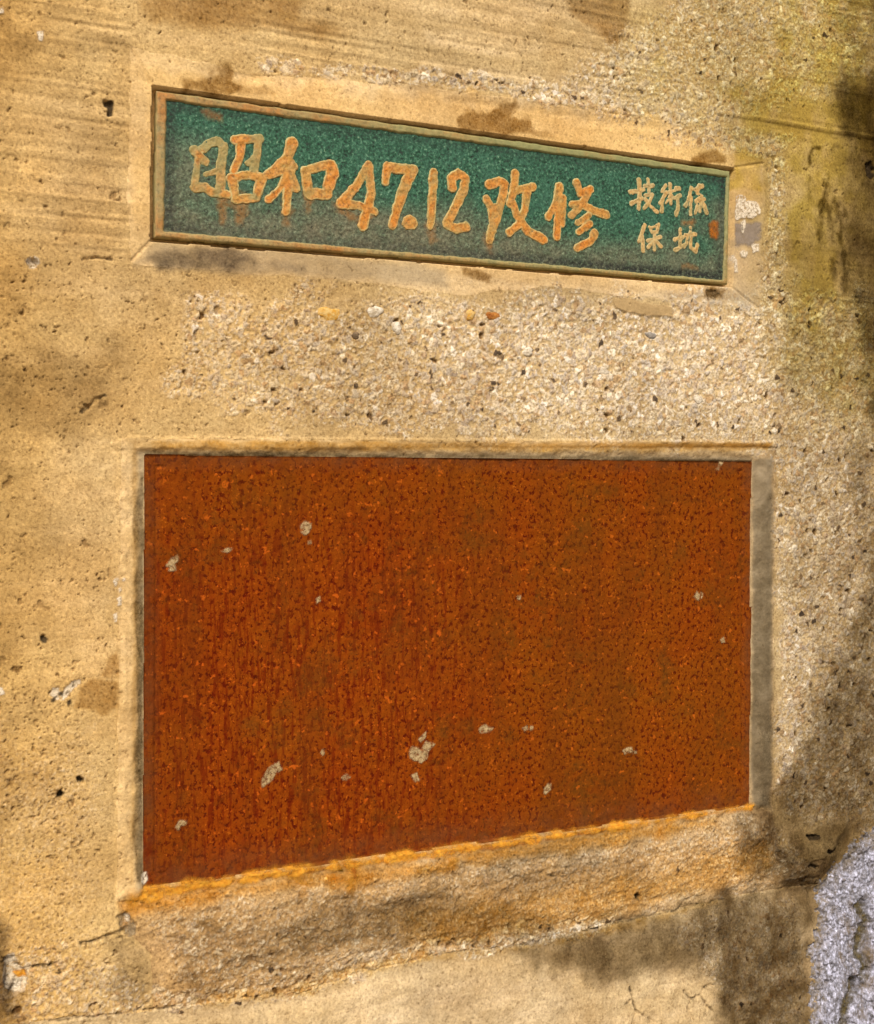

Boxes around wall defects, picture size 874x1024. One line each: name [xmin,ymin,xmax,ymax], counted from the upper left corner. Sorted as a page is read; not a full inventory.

rust [129,811,708,904]